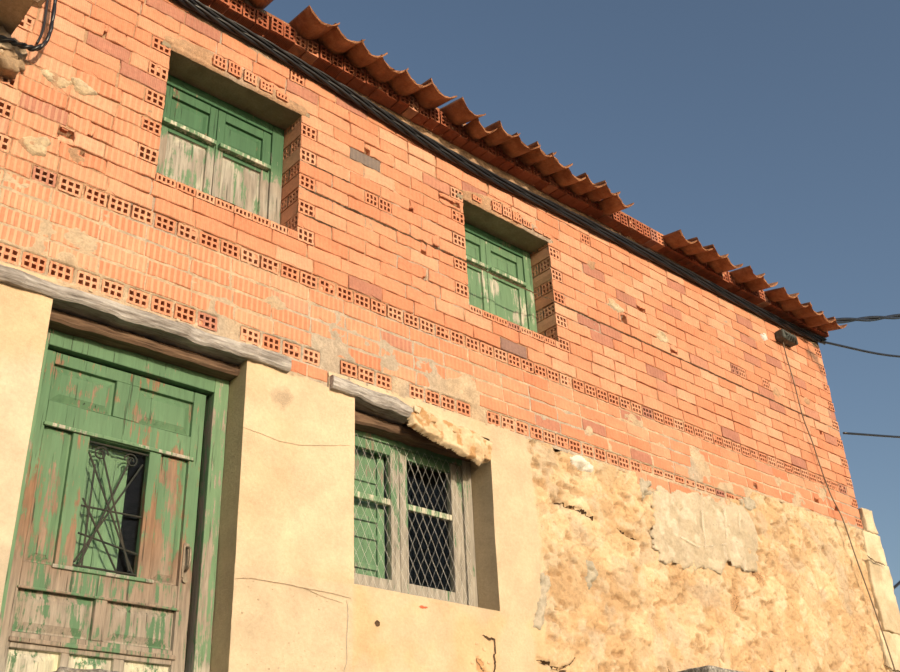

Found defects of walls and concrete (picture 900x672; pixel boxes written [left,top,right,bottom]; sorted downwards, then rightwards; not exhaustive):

flaking render [407,406,493,466]
crack [476,635,496,672]